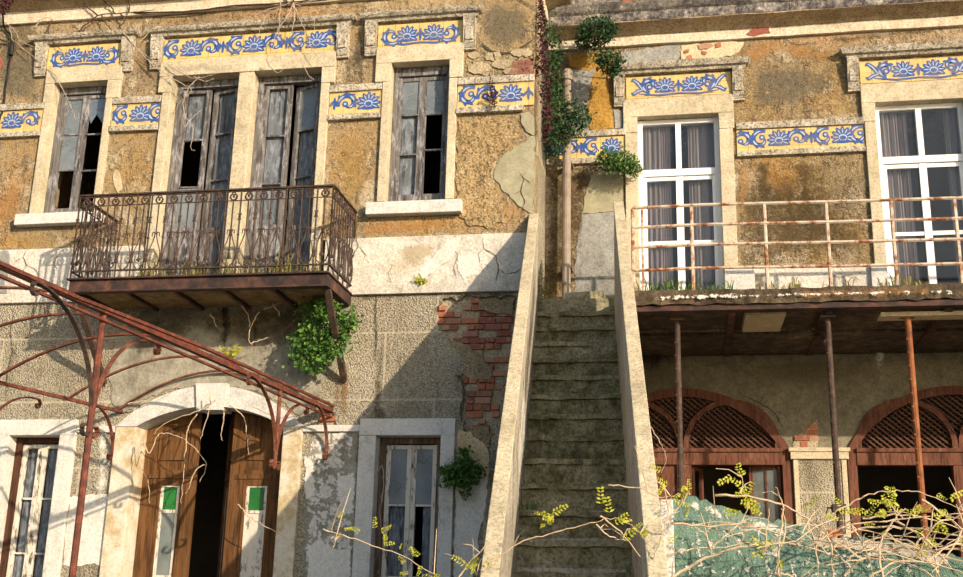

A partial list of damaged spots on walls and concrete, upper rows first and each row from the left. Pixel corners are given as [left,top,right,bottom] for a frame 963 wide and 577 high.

flaking render [465,41,536,77]
flaking render [681,27,770,59]
leakage [744,164,851,253]
crack [453,235,520,279]
flaking render [437,295,517,577]
flaking render [793,419,819,447]
peeling [303,408,356,577]